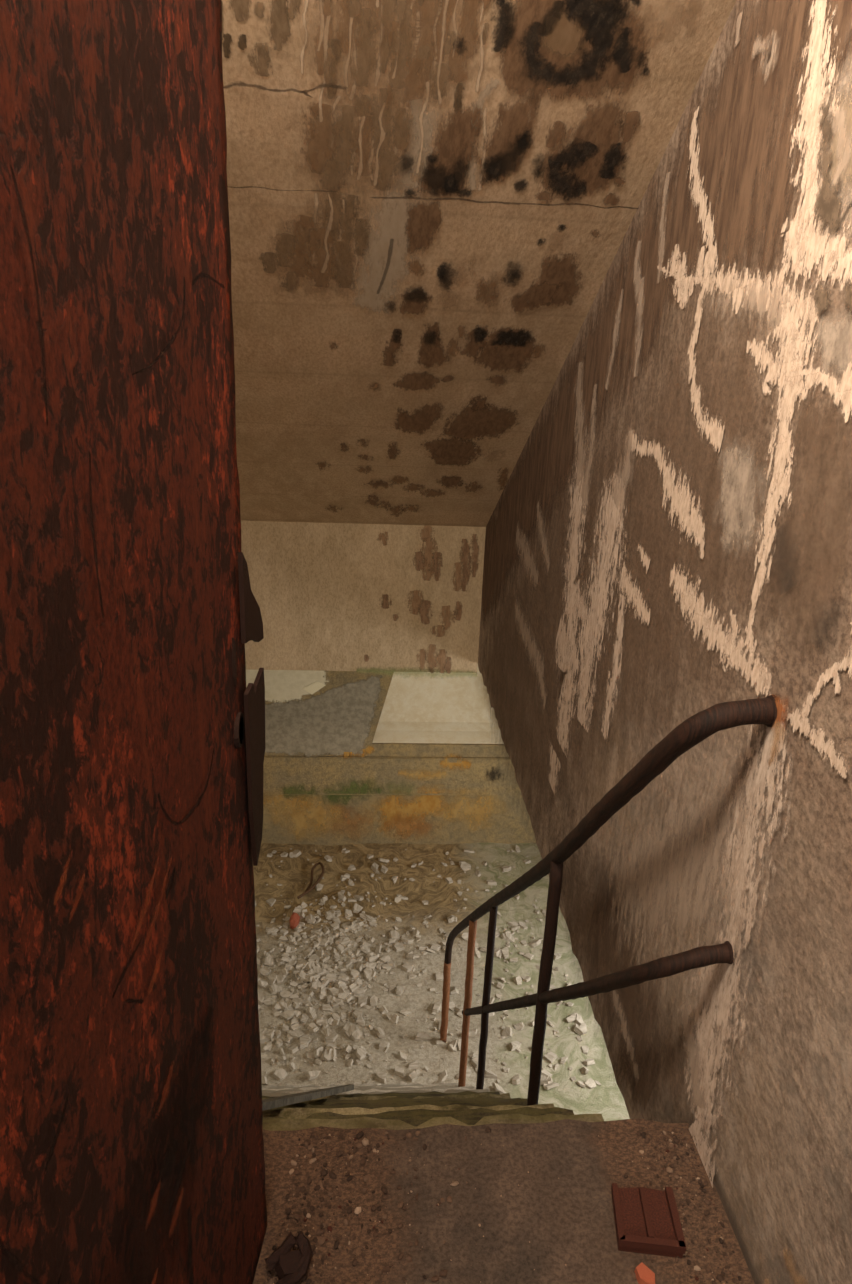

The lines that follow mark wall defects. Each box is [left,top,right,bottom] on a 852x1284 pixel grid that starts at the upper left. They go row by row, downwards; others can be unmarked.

crack [223,82,346,98]
damp [222,0,852,1187]
peeling [246,670,382,757]